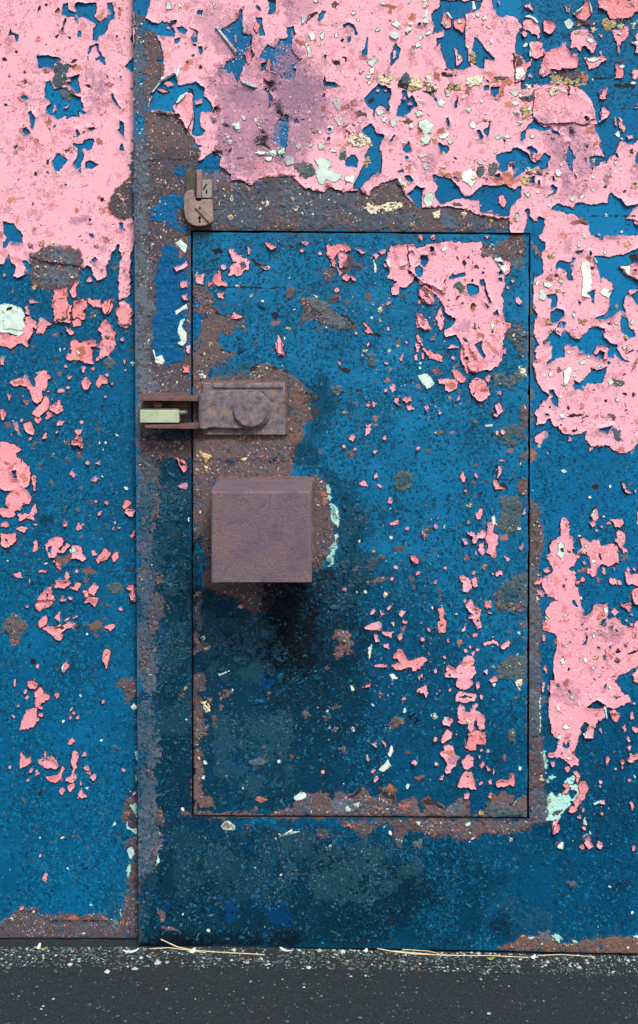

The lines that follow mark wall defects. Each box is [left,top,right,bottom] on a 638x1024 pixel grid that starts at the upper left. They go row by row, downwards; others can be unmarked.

peeling [598,0,638,54]
peeling [64,320,124,390]
peeling [174,239,270,373]
peeling [10,370,84,448]
rust [90,16,589,847]
peeling [0,441,98,553]
peeling [26,537,99,641]
peeling [12,679,59,730]
peeling [359,459,638,849]
peeling [8,738,97,798]
rust [0,724,166,943]
rust [497,929,638,953]